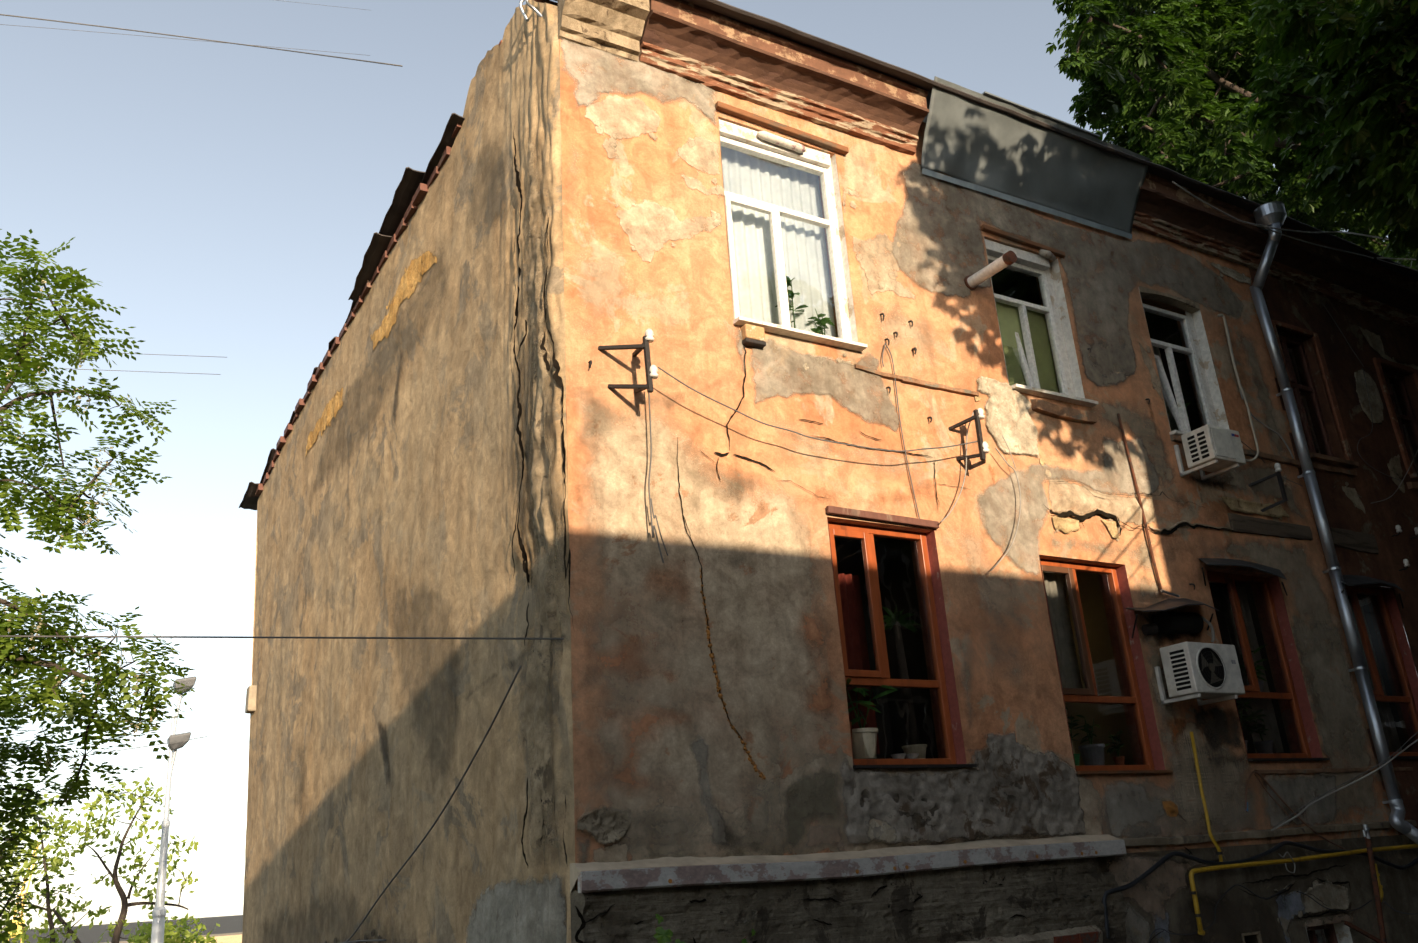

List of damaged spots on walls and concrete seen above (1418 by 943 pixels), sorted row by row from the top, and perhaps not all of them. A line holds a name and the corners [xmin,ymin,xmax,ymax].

peeling [585,94,661,159]
peeling [615,137,724,262]
peeling [853,233,915,299]
spalling [524,139,557,556]
crack [512,127,574,645]
crack [799,419,968,506]
spalling [975,376,1046,466]
crack [1044,481,1233,536]
crack [677,328,825,780]
peeling [577,403,1255,869]
flaking render [1053,932,1099,943]
peeling [1108,856,1193,943]